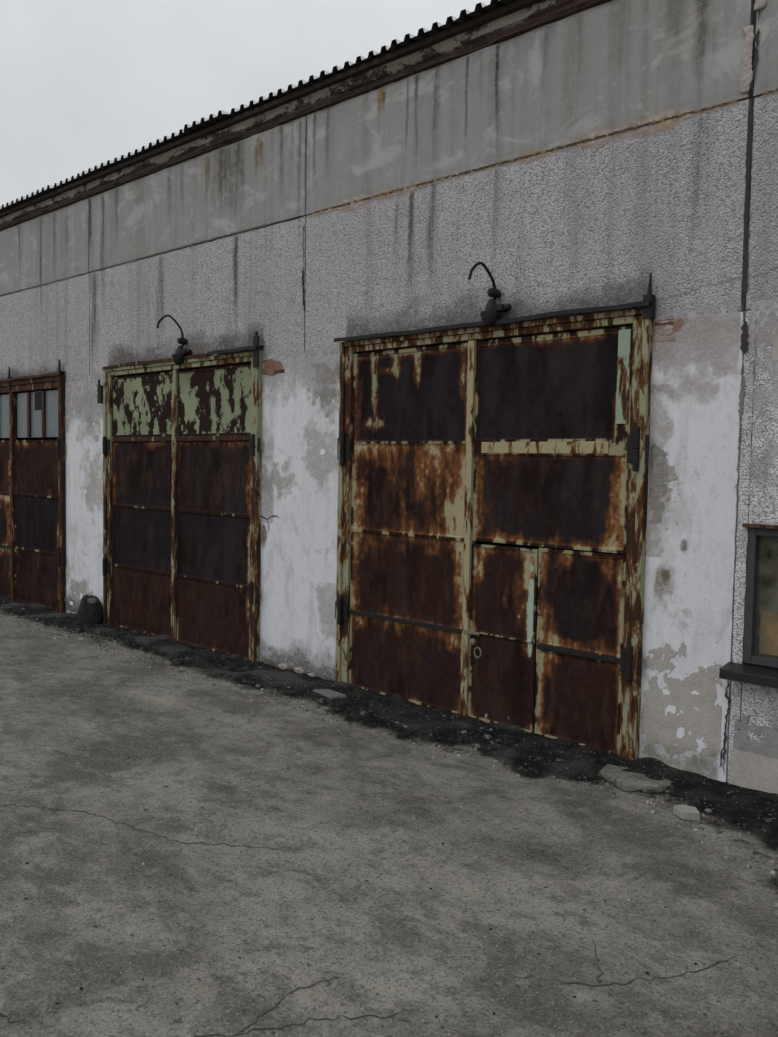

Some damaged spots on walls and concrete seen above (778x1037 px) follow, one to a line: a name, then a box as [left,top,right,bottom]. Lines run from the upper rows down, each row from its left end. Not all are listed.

flaking render [652,318,688,342]
flaking render [262,359,285,376]
peeling [302,362,340,486]
peeling [261,461,296,497]
peeling [647,384,680,556]
peeling [316,582,336,637]
peeling [278,663,316,677]